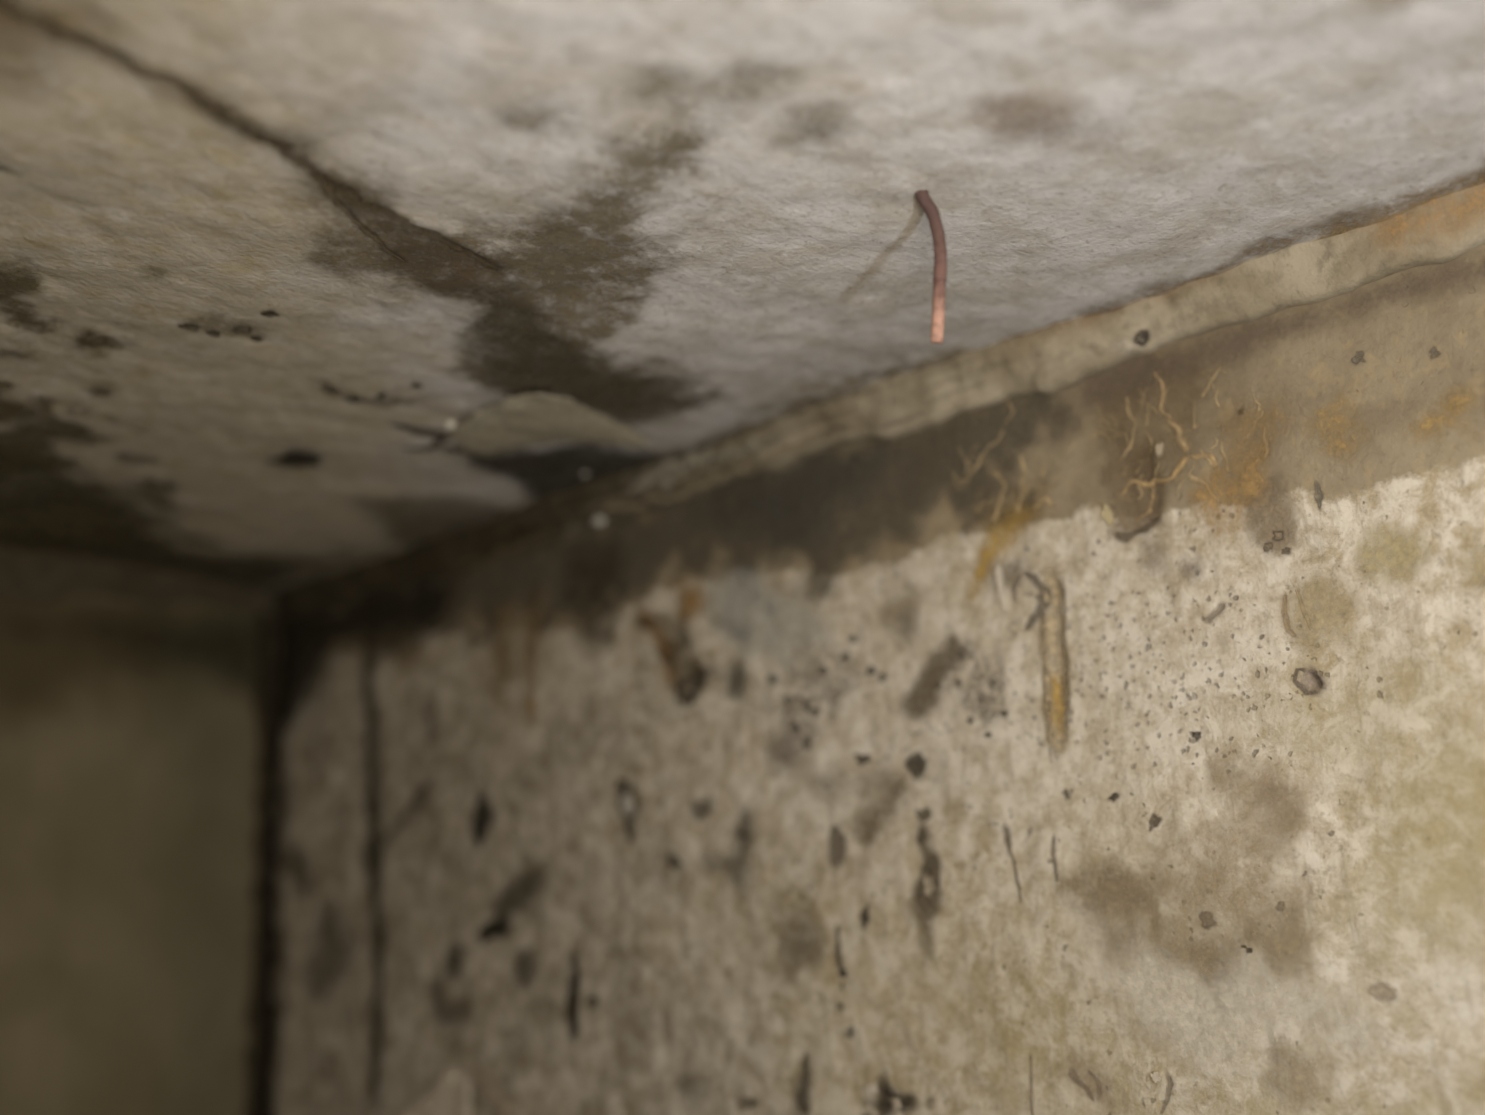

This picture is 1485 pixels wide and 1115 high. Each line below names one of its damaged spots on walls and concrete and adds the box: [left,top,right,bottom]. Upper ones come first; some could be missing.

water stain [0,263,52,334]
water stain [76,331,118,353]
crack [0,0,501,269]
water stain [311,132,719,423]
water stain [1245,209,1388,256]
water stain [0,382,331,592]
water stain [273,394,1064,755]